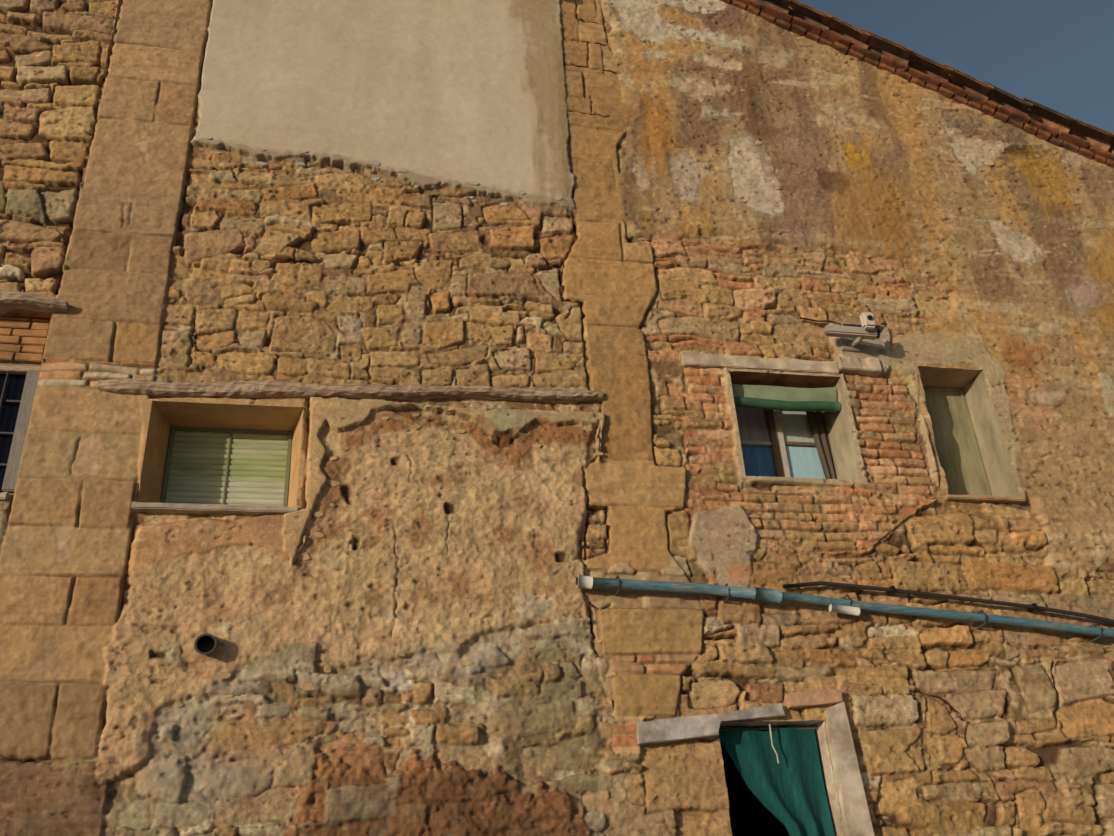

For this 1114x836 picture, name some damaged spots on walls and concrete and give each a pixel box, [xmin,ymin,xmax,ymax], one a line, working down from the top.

peeling [602,0,882,131]
peeling [630,152,703,203]
peeling [726,136,784,218]
crack [539,225,590,380]
flaking render [297,413,604,561]
flaking render [155,619,574,751]
flaking render [576,639,617,678]